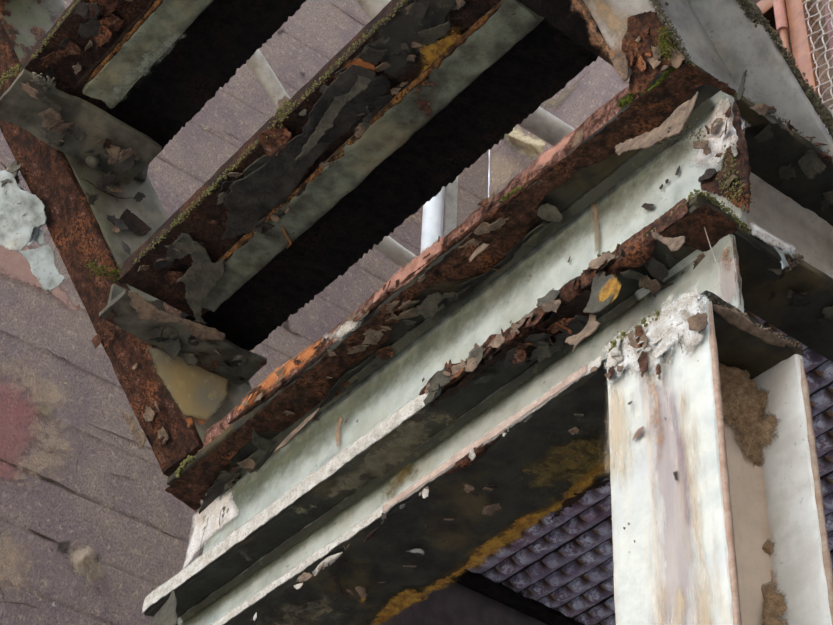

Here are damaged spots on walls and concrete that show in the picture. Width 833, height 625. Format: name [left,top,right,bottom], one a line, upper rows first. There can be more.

peeling [611,38,685,82]
peeling [207,37,408,240]
spalling [501,127,574,174]
peeling [614,92,699,155]
rust [699,144,747,208]
rust [120,209,152,235]
peeling [373,237,444,306]
rust [165,0,738,512]
peeling [395,203,563,325]
peeling [128,233,228,420]
leakage [524,391,628,486]
leakage [386,464,417,497]